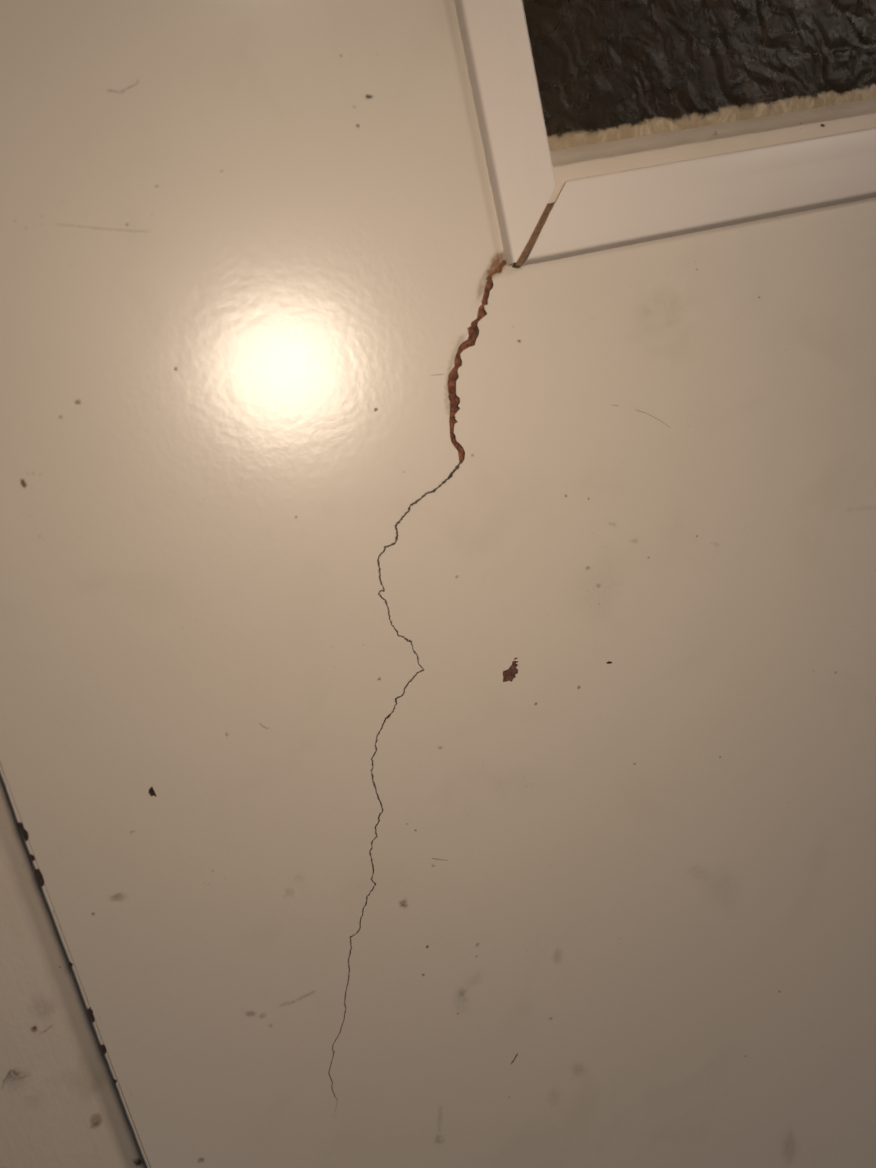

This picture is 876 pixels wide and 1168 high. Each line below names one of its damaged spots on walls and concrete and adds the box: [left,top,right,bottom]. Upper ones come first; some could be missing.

crack [328,260,506,1096]